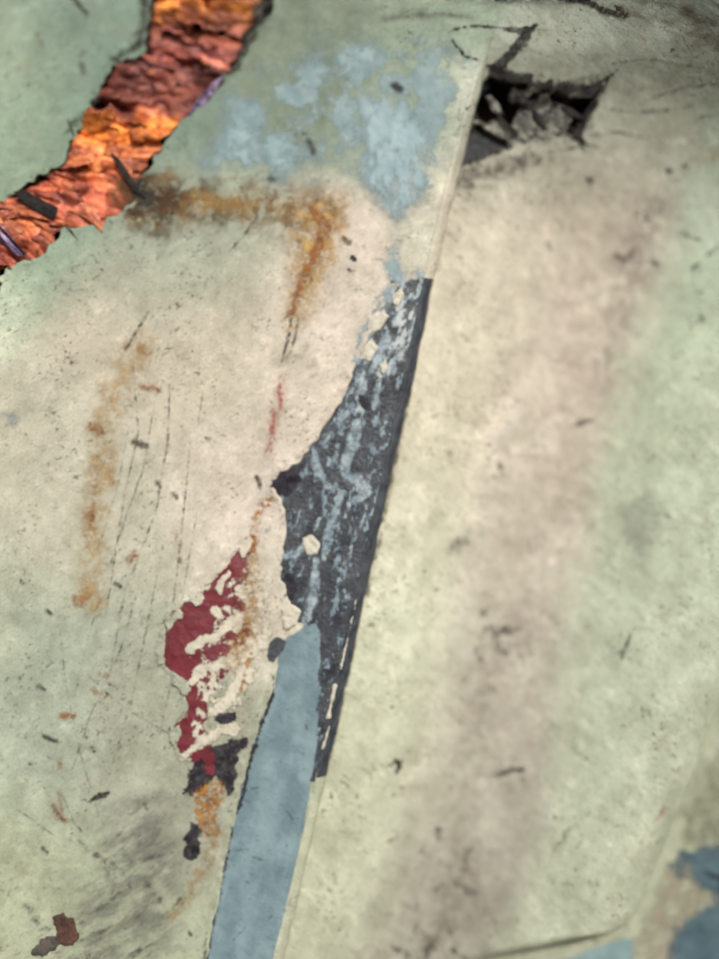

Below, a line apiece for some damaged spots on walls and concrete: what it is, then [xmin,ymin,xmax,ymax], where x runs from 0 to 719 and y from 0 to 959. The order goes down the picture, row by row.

crack [452,23,538,78]
crack [561,0,629,19]
crack [665,2,718,44]
peeling [462,71,609,165]
rust [116,173,343,356]
peeling [153,250,425,959]
rust [31,912,79,957]
peeling [568,837,719,959]